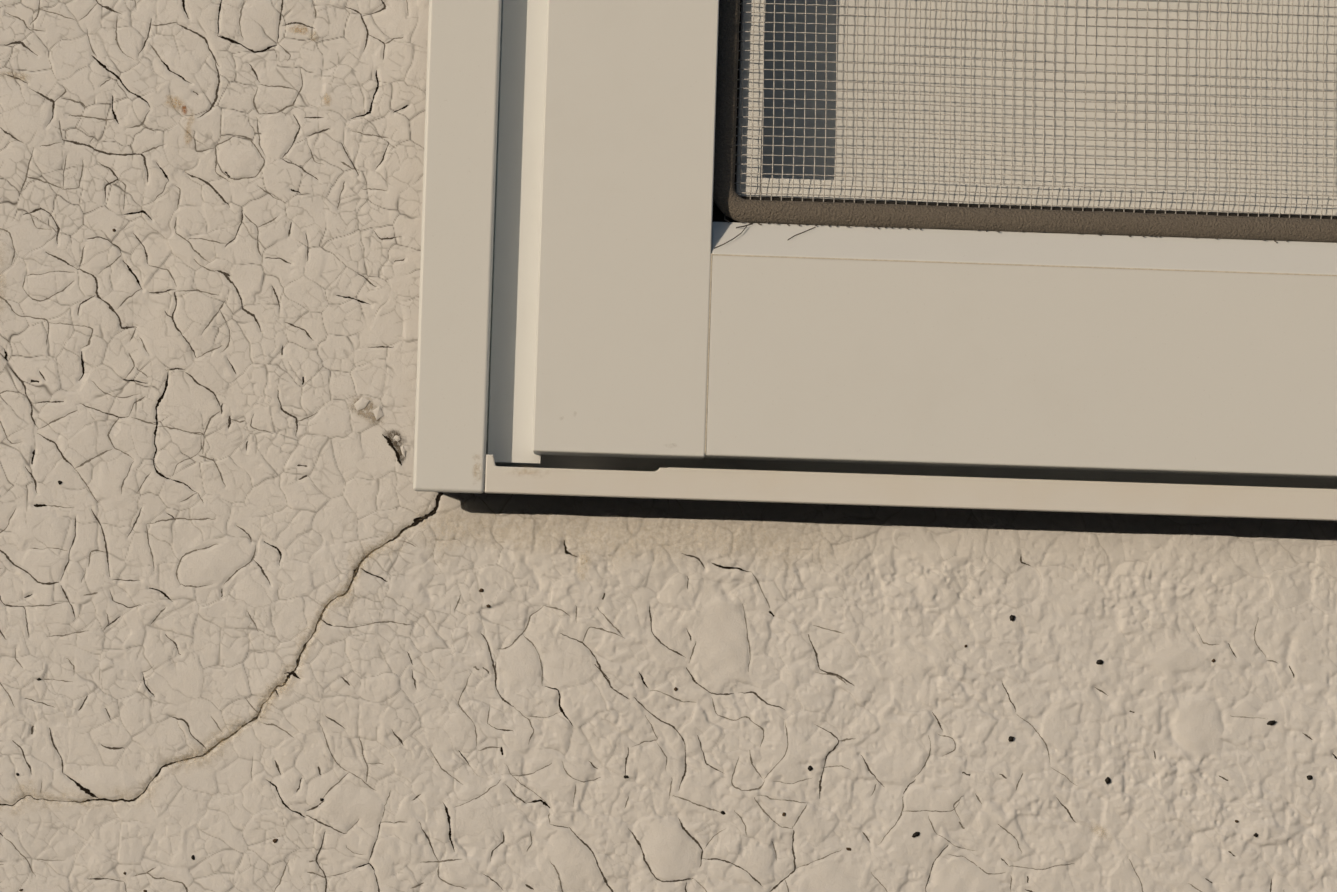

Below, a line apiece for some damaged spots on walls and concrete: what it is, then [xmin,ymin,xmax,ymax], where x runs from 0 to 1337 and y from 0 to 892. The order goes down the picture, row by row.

crack [0,0,443,877]
crack [90,867,188,892]